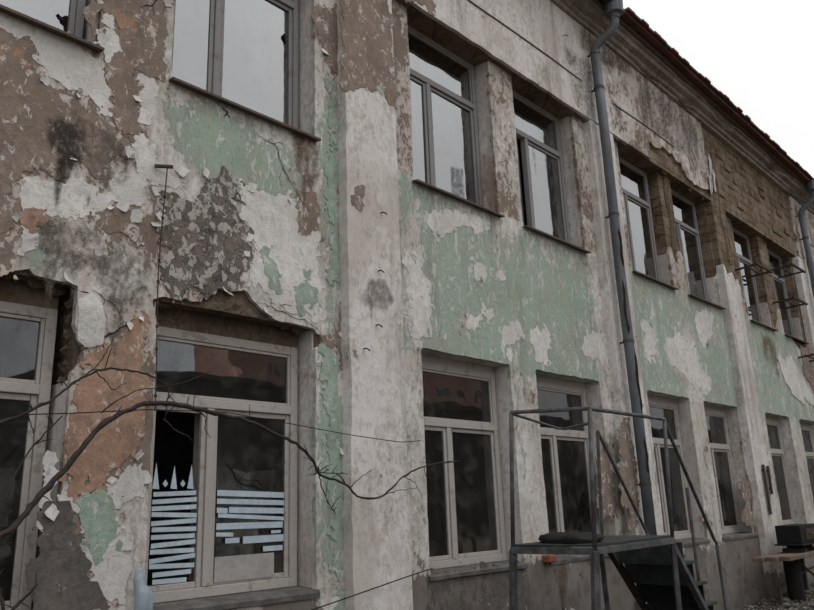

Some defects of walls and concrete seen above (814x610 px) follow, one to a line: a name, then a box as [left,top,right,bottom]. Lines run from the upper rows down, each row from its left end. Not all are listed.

peeling [311,0,398,110]
mould [49,119,129,201]
peeling [427,209,490,242]
peeling [0,0,343,610]
peeling [465,302,494,331]
peeling [469,251,506,283]
peeling [500,321,554,367]
peeling [640,307,714,395]
peeling [776,343,814,407]
peeling [594,415,643,532]